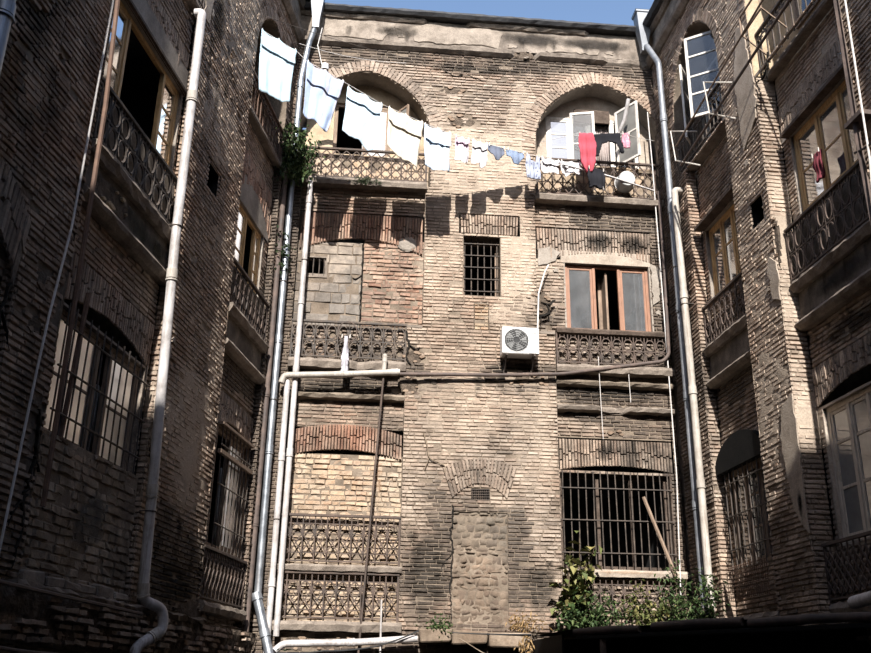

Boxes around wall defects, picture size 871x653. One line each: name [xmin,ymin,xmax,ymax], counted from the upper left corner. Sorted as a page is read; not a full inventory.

flaking render [324,19,534,61]
flaking render [546,44,613,56]
crack [0,282,13,350]
crack [7,409,42,570]